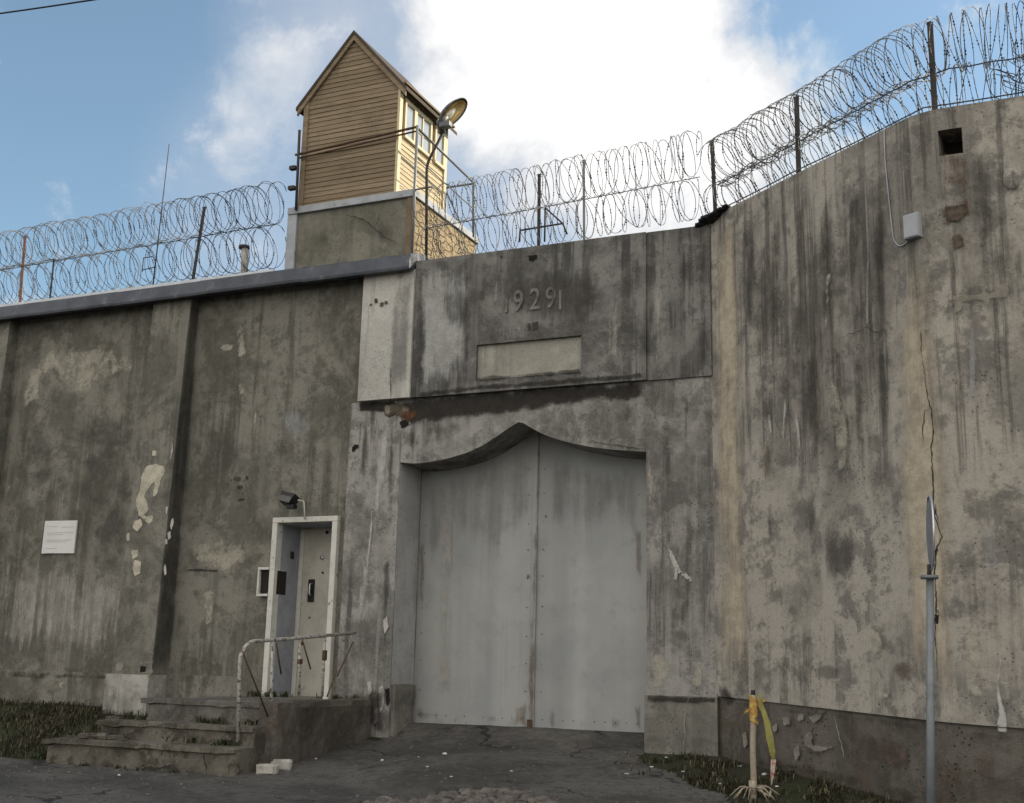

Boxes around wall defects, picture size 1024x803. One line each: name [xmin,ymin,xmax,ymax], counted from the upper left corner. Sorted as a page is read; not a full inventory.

spalling [944,204,968,249]
water stain [25,346,131,404]
water stain [832,382,860,447]
water stain [901,278,947,663]
flaking render [126,443,173,576]
crack [920,328,943,680]
water stain [195,541,244,570]
water stain [10,574,119,642]
spalling [772,712,833,761]
water stain [997,691,1007,732]